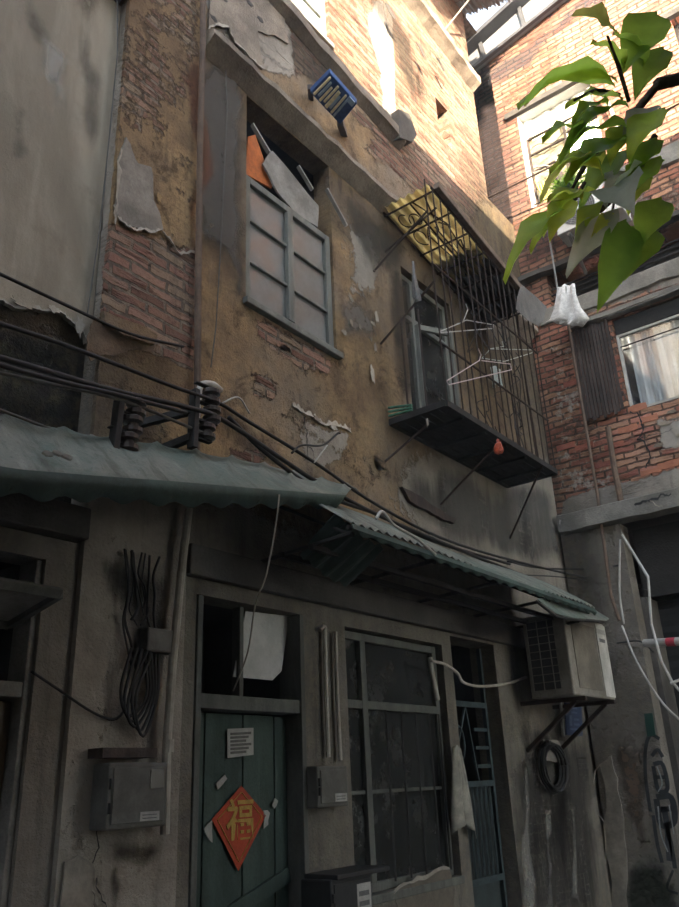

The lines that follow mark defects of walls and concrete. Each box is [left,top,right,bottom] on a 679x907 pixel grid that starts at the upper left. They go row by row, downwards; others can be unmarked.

flaking render [208,0,288,70]
flaking render [0,137,195,361]
flaking render [256,320,333,376]
flaking render [281,402,390,486]